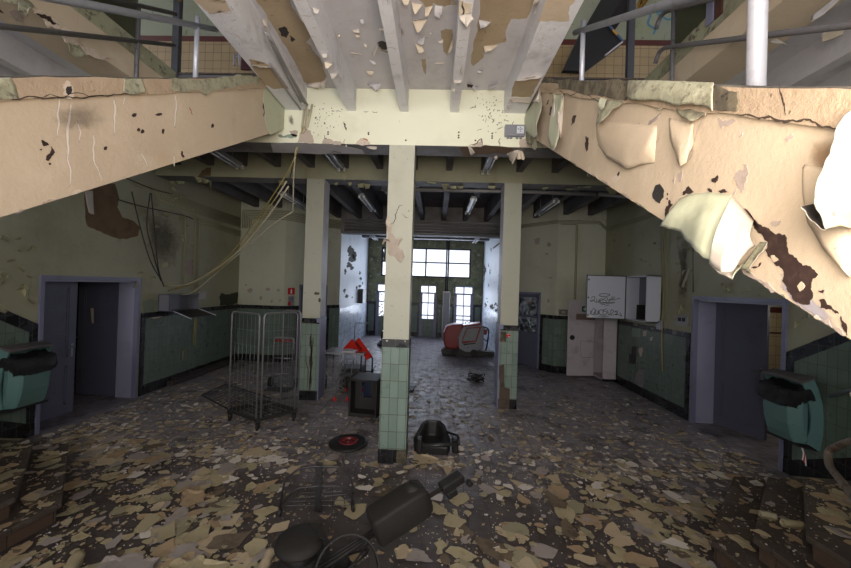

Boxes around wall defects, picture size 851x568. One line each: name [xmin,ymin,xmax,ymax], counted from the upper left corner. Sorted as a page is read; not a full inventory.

peeling [194,0,231,14]
peeling [256,0,338,89]
peeling [349,19,388,91]
peeling [402,0,575,102]
crack [11,92,127,100]
peeling [460,76,714,164]
flaking render [72,183,140,239]
peeling [382,217,405,263]
peeling [652,175,848,336]